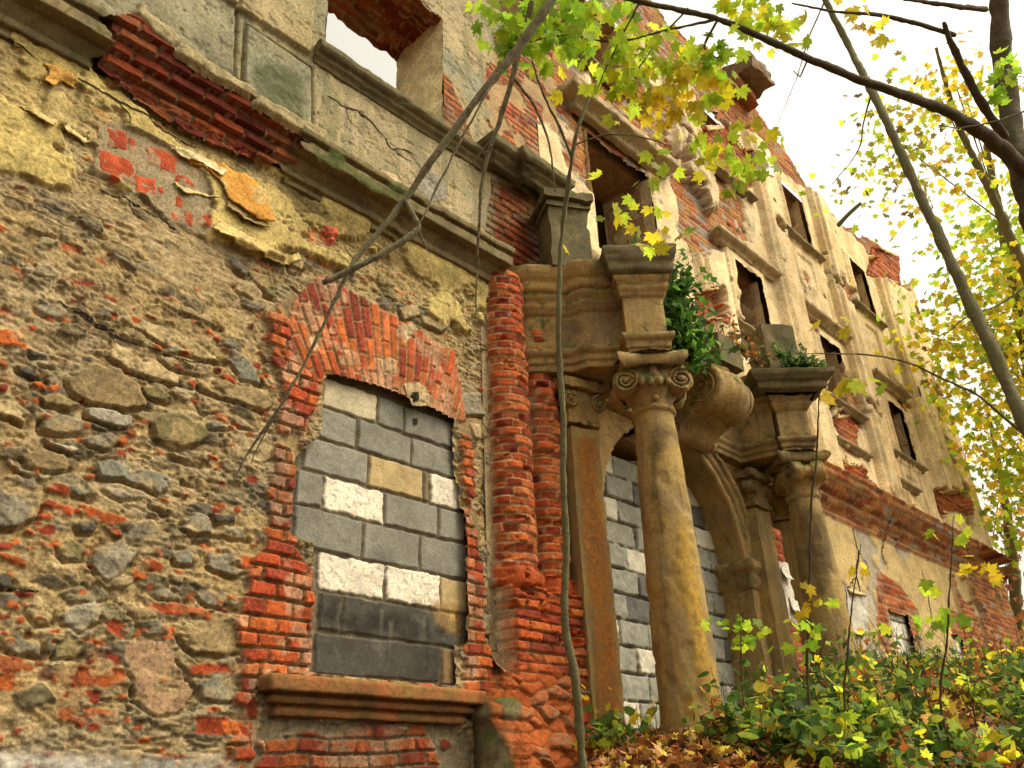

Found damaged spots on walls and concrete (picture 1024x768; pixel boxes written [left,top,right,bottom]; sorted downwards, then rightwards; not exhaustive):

spalling [19,3,327,266]
crack [328,96,417,161]
spalling [934,488,975,516]